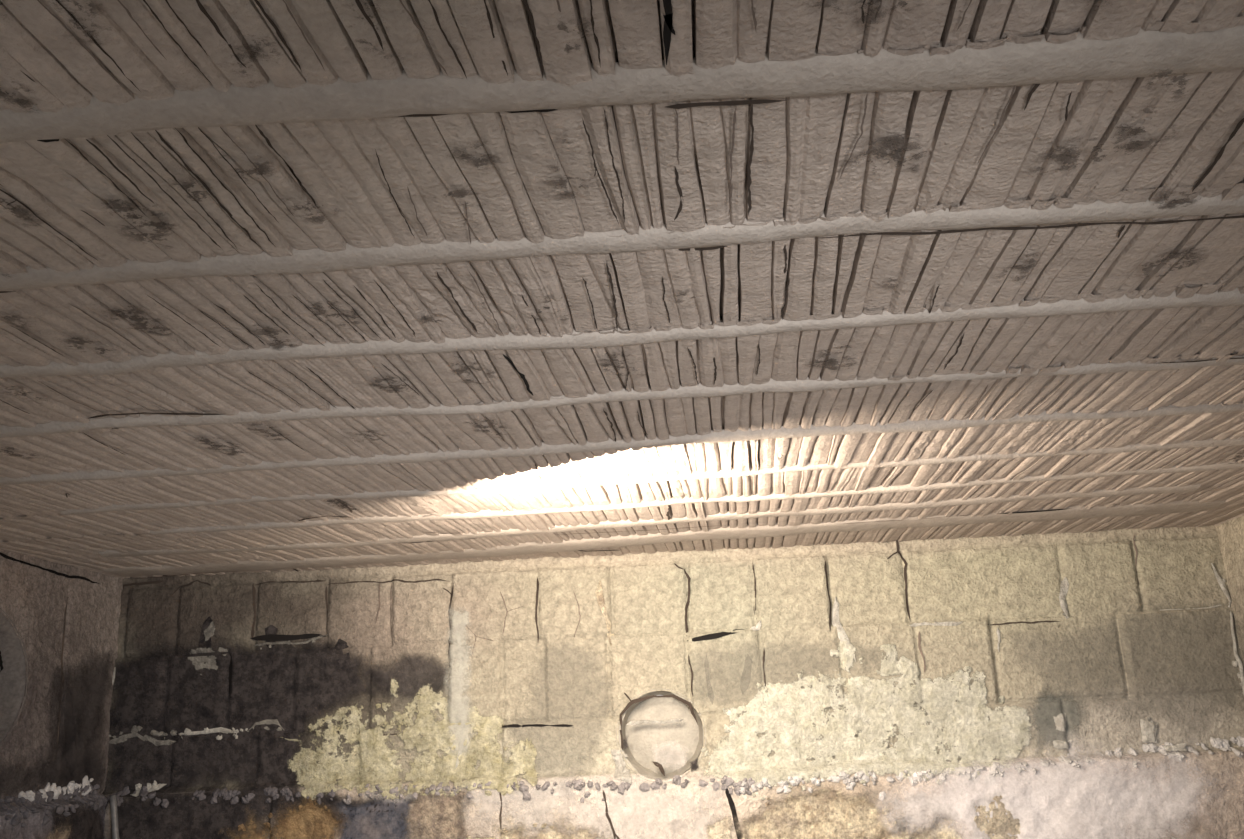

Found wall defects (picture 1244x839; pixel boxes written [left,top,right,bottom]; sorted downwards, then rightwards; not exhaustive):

crack [37,0,141,92]
crack [118,0,246,86]
crack [399,0,467,78]
crack [523,0,601,78]
crack [663,0,675,65]
crack [508,107,625,224]
crack [666,99,787,251]
crack [781,245,790,320]
crack [619,563,766,750]
crack [652,761,665,776]
crack [603,791,620,839]
crack [725,789,743,839]